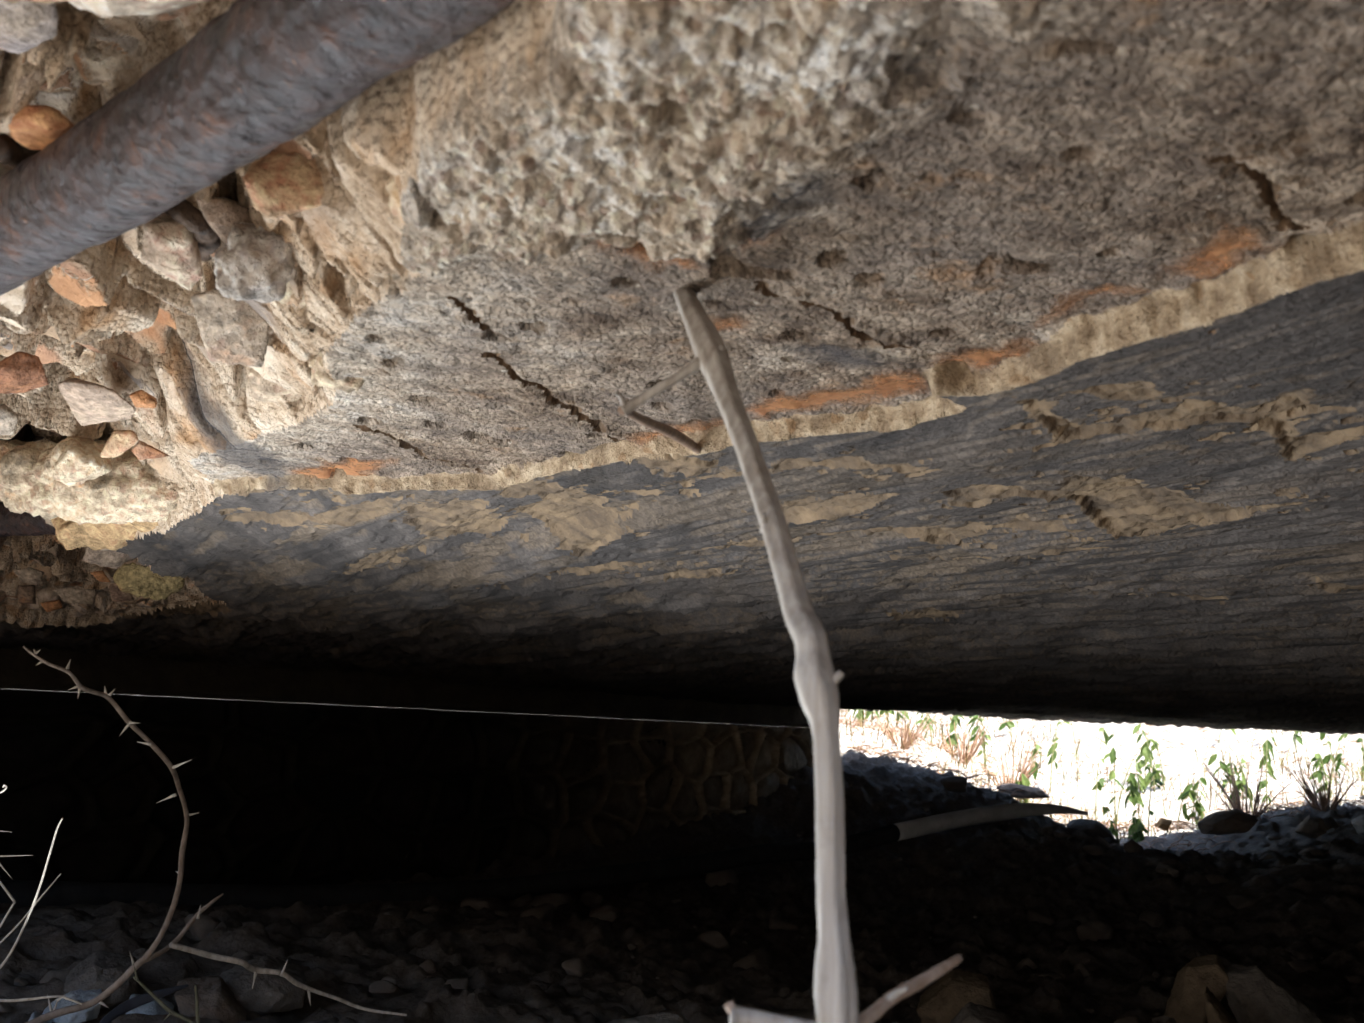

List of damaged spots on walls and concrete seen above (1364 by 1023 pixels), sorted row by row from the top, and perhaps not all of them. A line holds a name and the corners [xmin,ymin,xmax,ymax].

crack [1209,148,1312,233]
crack [447,296,621,442]
peeling [0,0,1364,629]
rust [745,375,926,416]